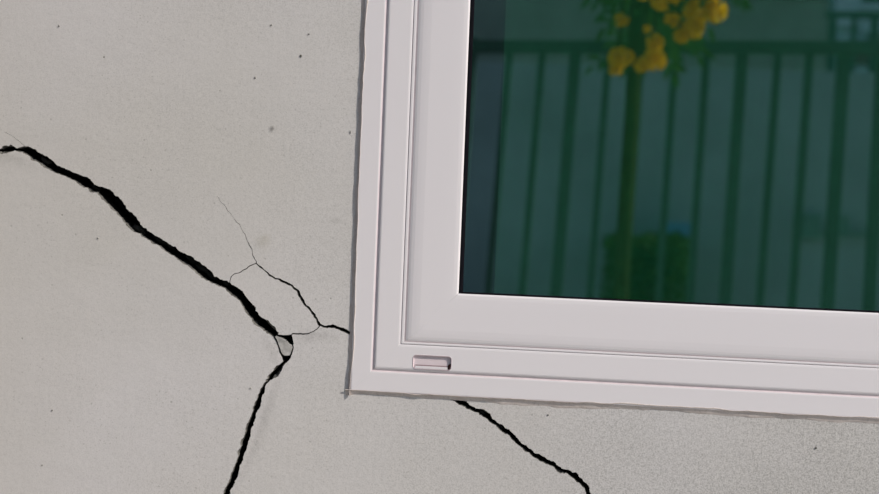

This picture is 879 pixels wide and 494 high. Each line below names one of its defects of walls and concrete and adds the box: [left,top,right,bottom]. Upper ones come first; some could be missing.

crack [0,133,350,494]
crack [453,400,591,494]